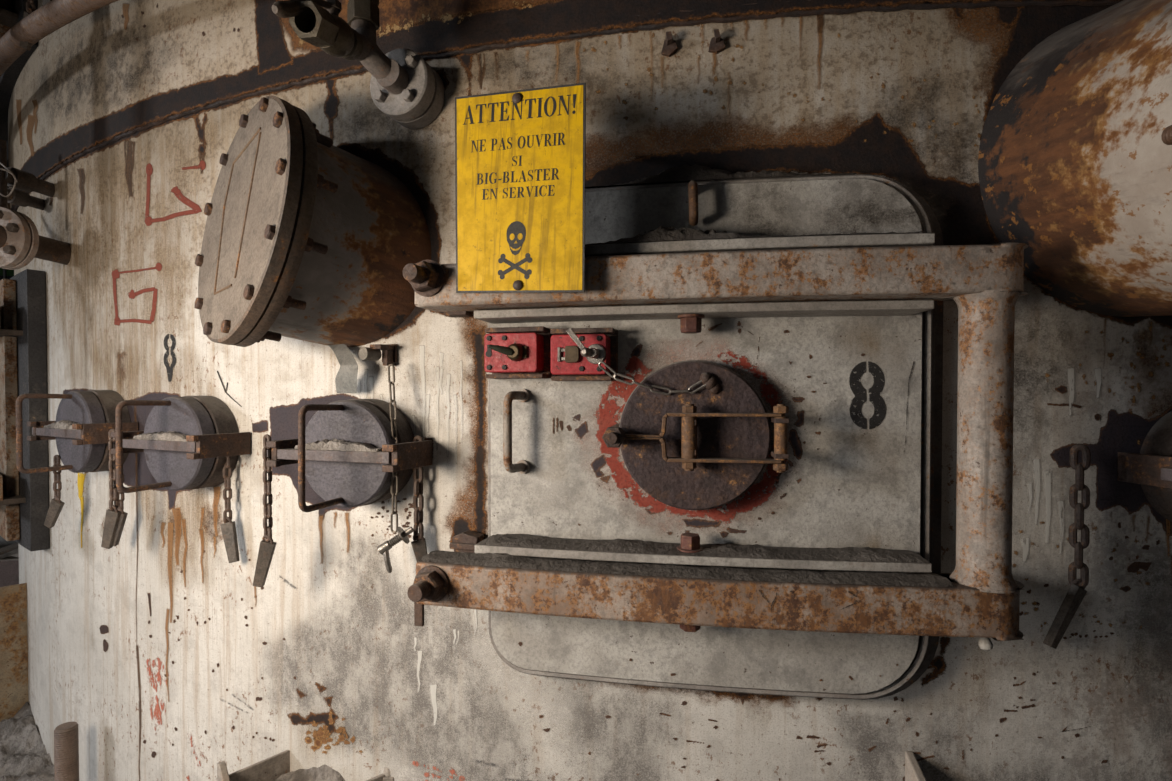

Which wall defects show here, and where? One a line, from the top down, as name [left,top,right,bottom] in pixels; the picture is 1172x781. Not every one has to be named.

rust [338,0,351,27]
peeling [376,11,472,38]
rust [376,0,555,35]
rust [585,15,858,178]
rust [1045,373,1081,408]
rust [1101,515,1172,592]
rust [160,486,222,702]
rust [304,710,362,754]